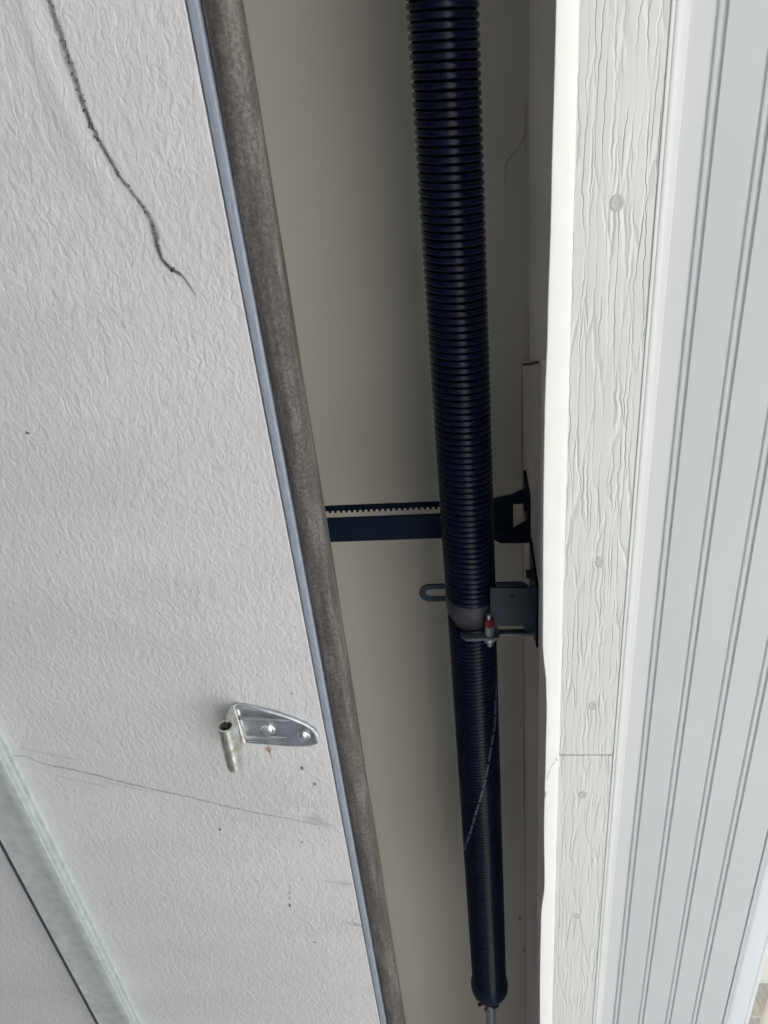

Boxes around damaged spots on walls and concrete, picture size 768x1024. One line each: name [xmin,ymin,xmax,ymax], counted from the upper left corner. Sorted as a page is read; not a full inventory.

crack [48,0,196,295]